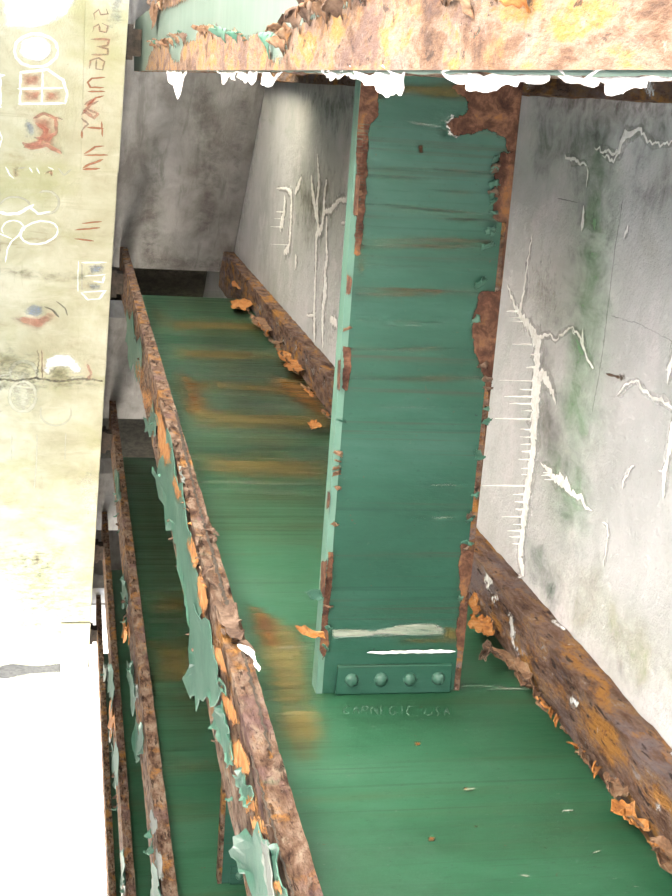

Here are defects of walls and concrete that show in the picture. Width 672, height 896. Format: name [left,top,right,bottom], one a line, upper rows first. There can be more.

crack [270,154,347,348]
corrosion [337,346,351,391]
peeling [321,65,405,98]
corrosion [145,0,672,256]
corrosion [403,82,523,487]
crack [482,235,610,576]
peeling [440,70,672,96]
crack [565,127,672,231]
crack [617,344,672,497]
peeling [125,311,288,896]
corrosion [319,552,334,660]
peeling [458,592,672,875]